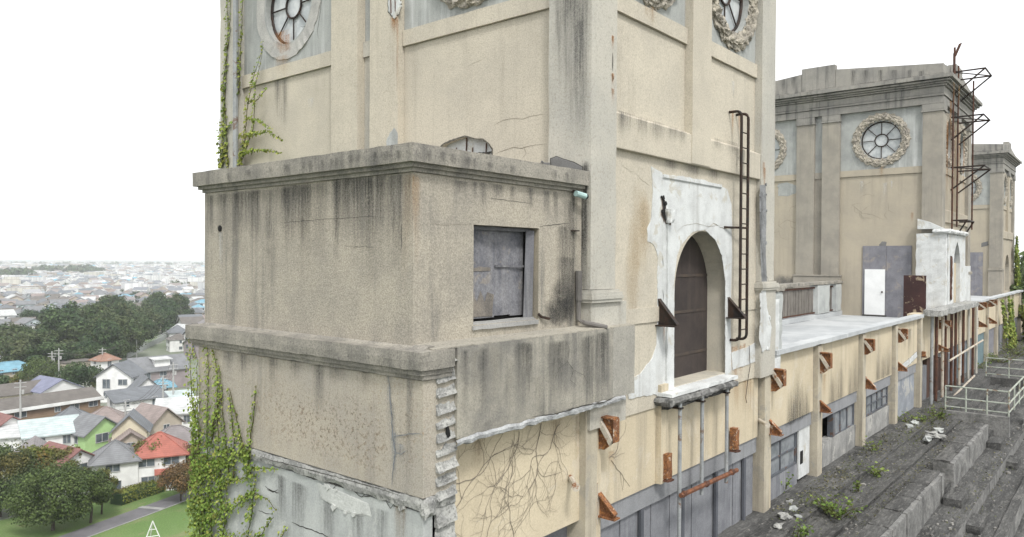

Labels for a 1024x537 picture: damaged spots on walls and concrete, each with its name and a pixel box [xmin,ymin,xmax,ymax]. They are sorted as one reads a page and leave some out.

spalling [661,195,671,225]
crack [260,379,422,509]
peeling [317,483,372,517]
spalling [420,358,626,537]